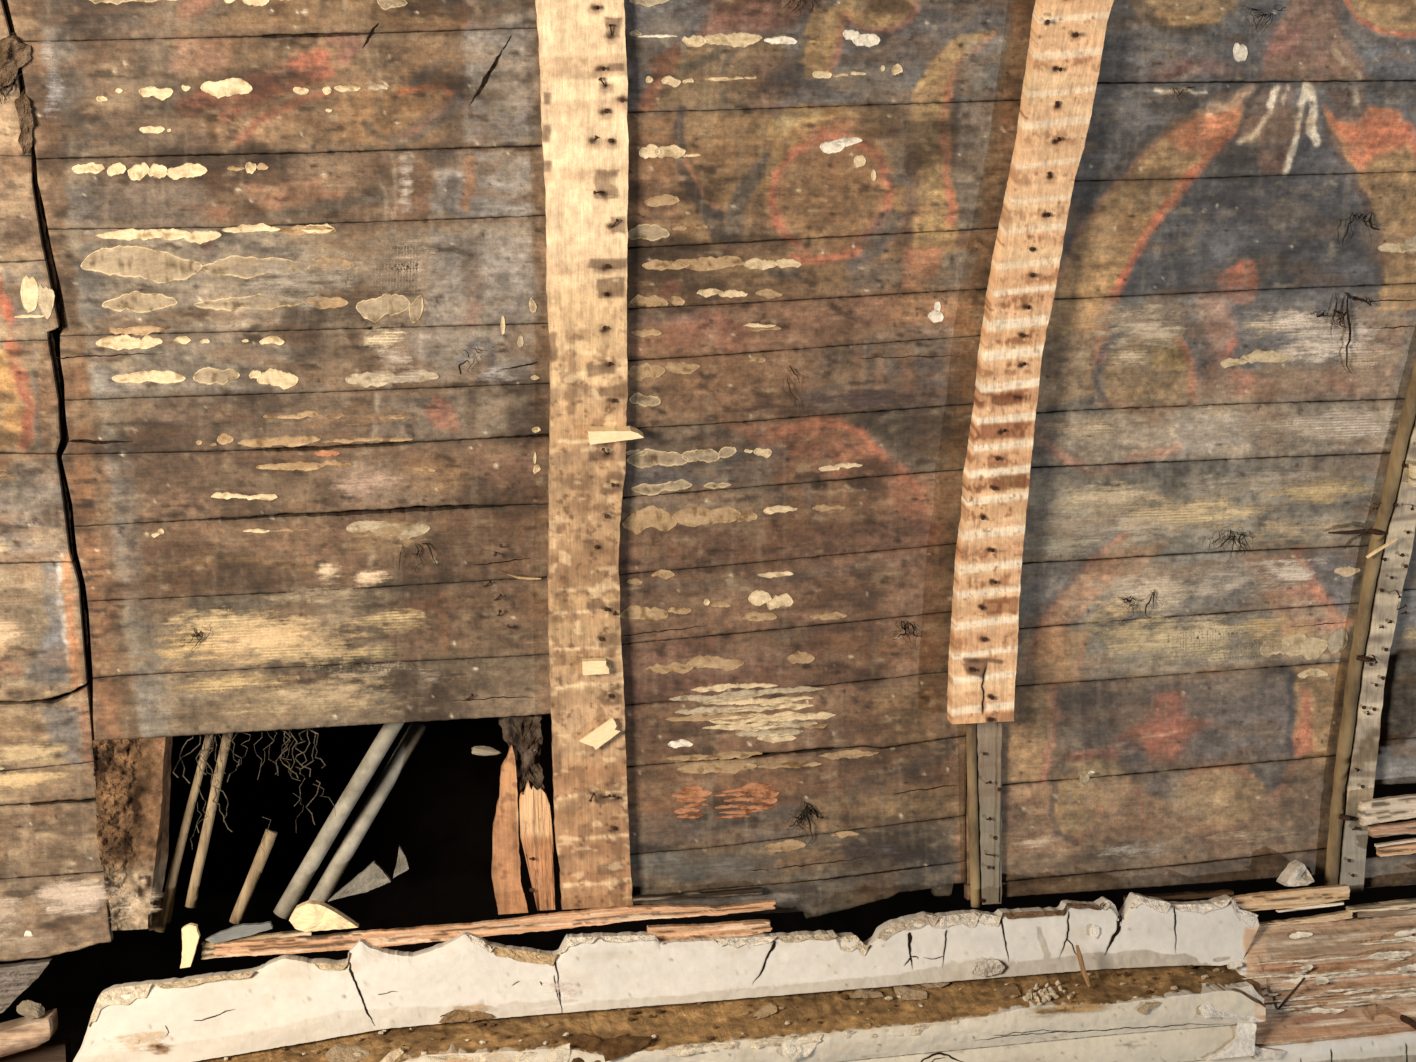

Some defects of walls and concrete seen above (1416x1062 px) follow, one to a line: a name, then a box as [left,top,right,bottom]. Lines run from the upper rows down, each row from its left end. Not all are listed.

peeling [629,30,798,48]
peeling [96,78,253,103]
peeling [72,162,207,181]
peeling [15,275,55,319]
peeling [80,223,424,351]
peeling [112,367,299,390]
peeling [622,446,846,535]
peeling [646,655,879,819]
crack [752,941,776,985]
crack [904,930,947,970]
crack [1000,917,1009,962]
crack [1059,911,1122,957]